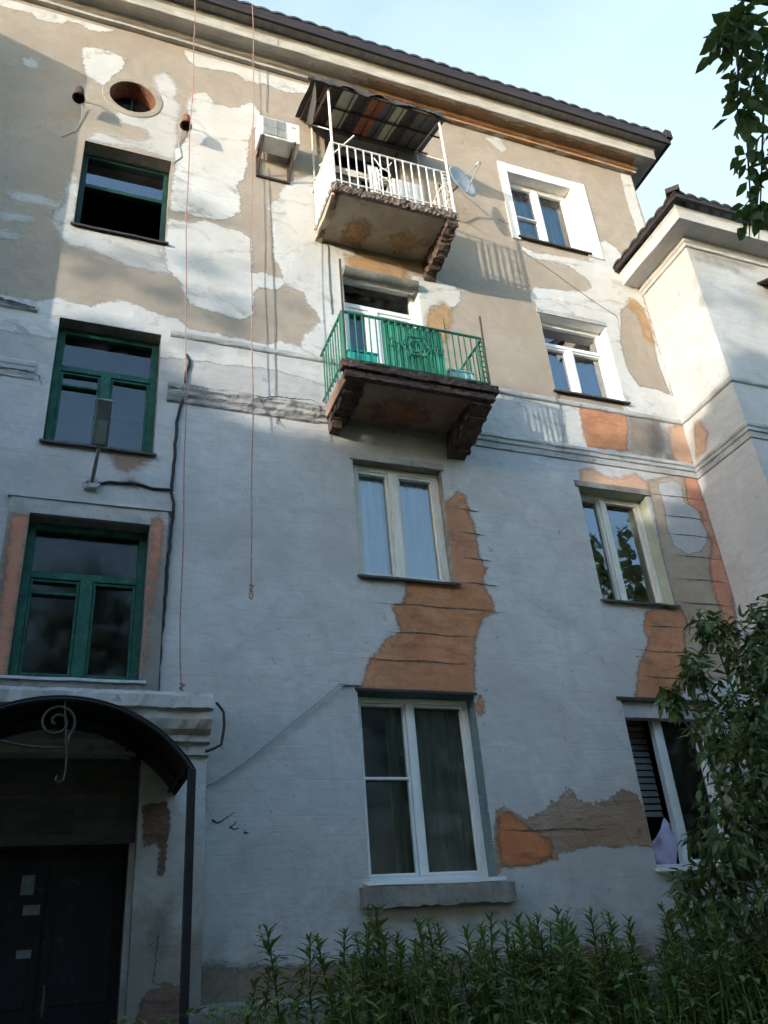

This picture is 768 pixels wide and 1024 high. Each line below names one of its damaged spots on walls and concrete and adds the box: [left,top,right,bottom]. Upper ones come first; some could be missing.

peeling [620,297,669,393]
flaking render [167,381,321,424]
peeling [579,408,629,453]
peeling [668,422,708,464]
peeling [0,514,29,675]
peeling [360,492,496,716]
peeling [580,468,740,698]
flaking render [141,800,171,876]
flaking render [493,787,652,875]
flaking render [135,982,180,1024]